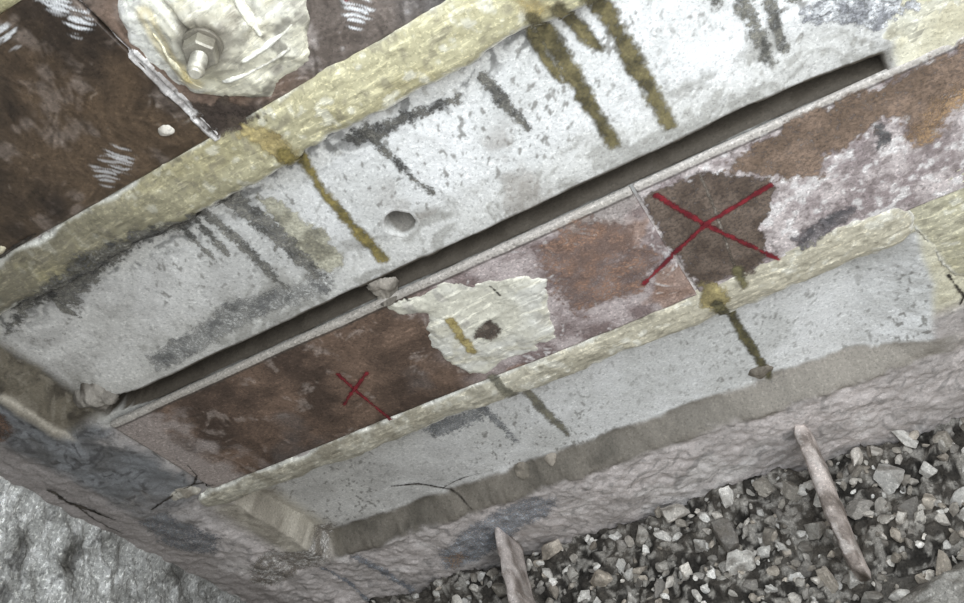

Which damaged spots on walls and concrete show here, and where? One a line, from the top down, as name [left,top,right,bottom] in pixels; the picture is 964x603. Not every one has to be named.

damp [711,0,801,66]
damp [520,0,677,149]
damp [237,123,390,263]
damp [732,266,748,289]
damp [698,281,772,379]
crack [47,490,123,534]
crack [397,473,478,509]